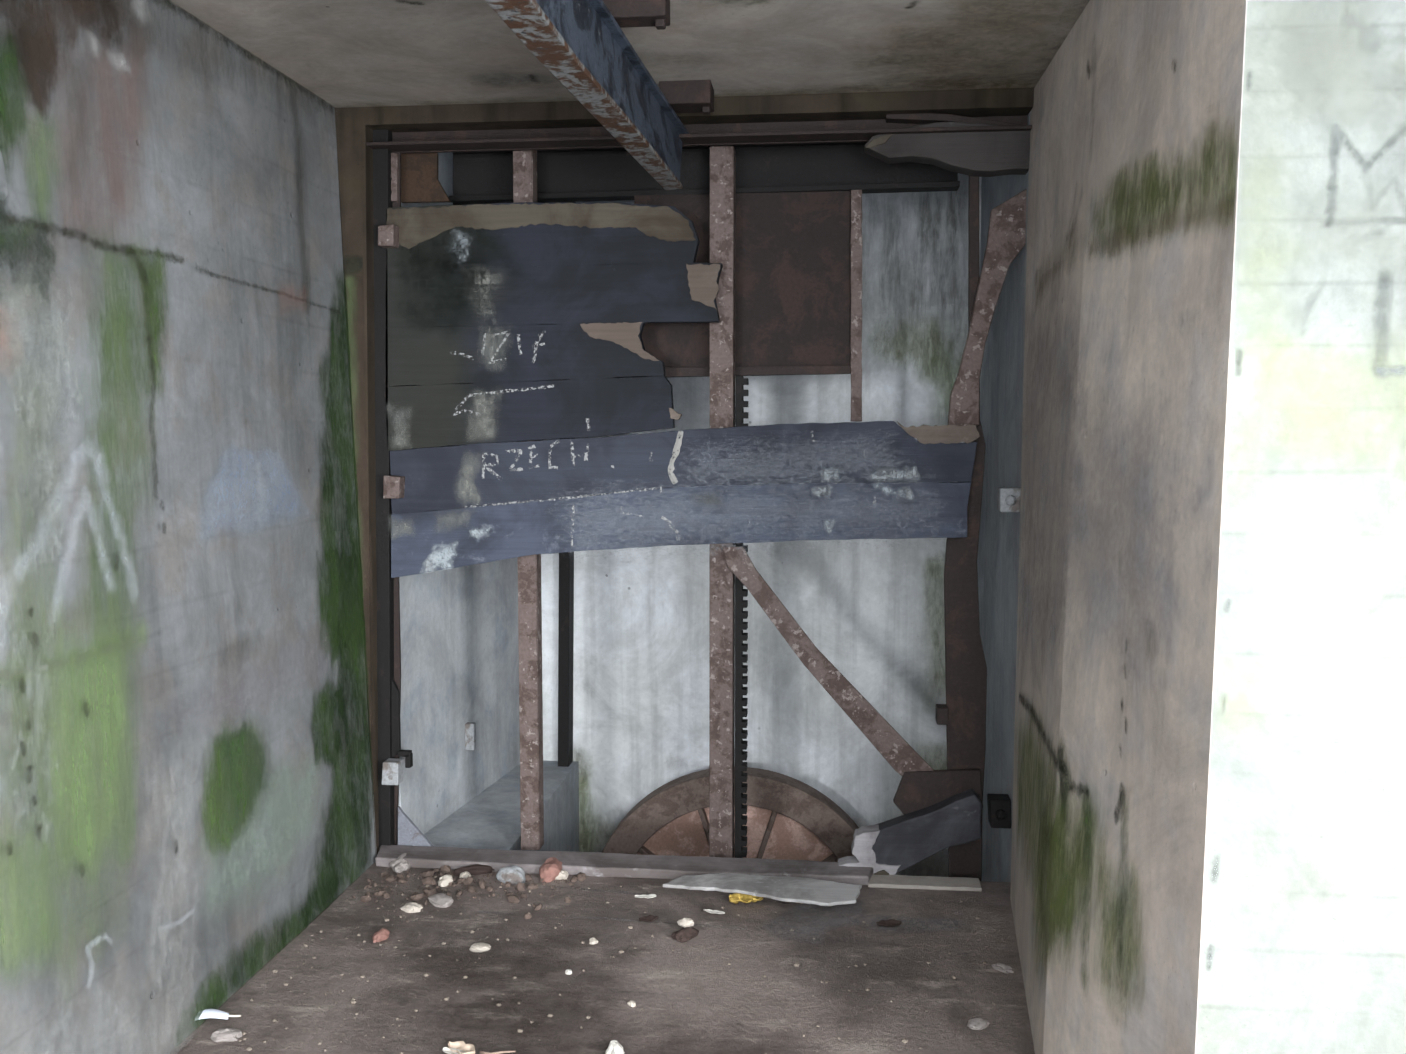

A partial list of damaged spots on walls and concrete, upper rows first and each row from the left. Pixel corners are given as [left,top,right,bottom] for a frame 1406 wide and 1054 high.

leakage [93,255,139,621]
crack [6,91,337,485]
leakage [343,256,373,778]
crack [1019,695,1088,801]